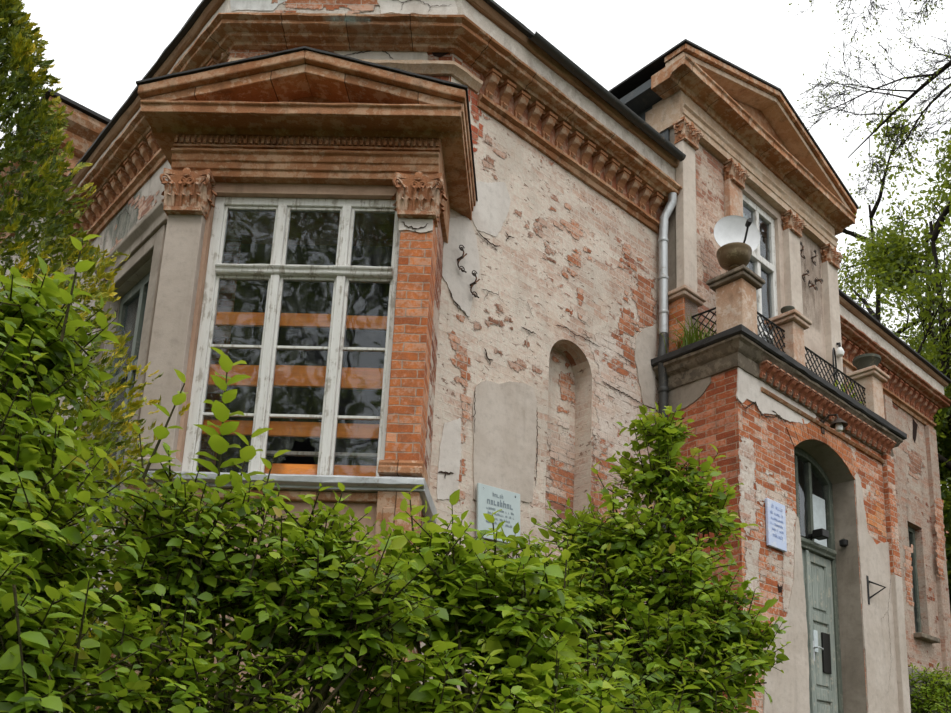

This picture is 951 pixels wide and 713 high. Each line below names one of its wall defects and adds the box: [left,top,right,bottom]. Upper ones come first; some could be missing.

flaking render [272,0,379,14]
crack [478,231,514,252]
flaking render [456,304,513,330]
flaking render [494,347,543,374]
flaking render [514,203,657,523]
flaking render [448,330,471,443]
flaking render [456,458,467,504]
flaking render [903,447,925,482]
flaking render [866,490,887,537]
flaking render [934,497,949,585]
flaking render [903,536,914,606]